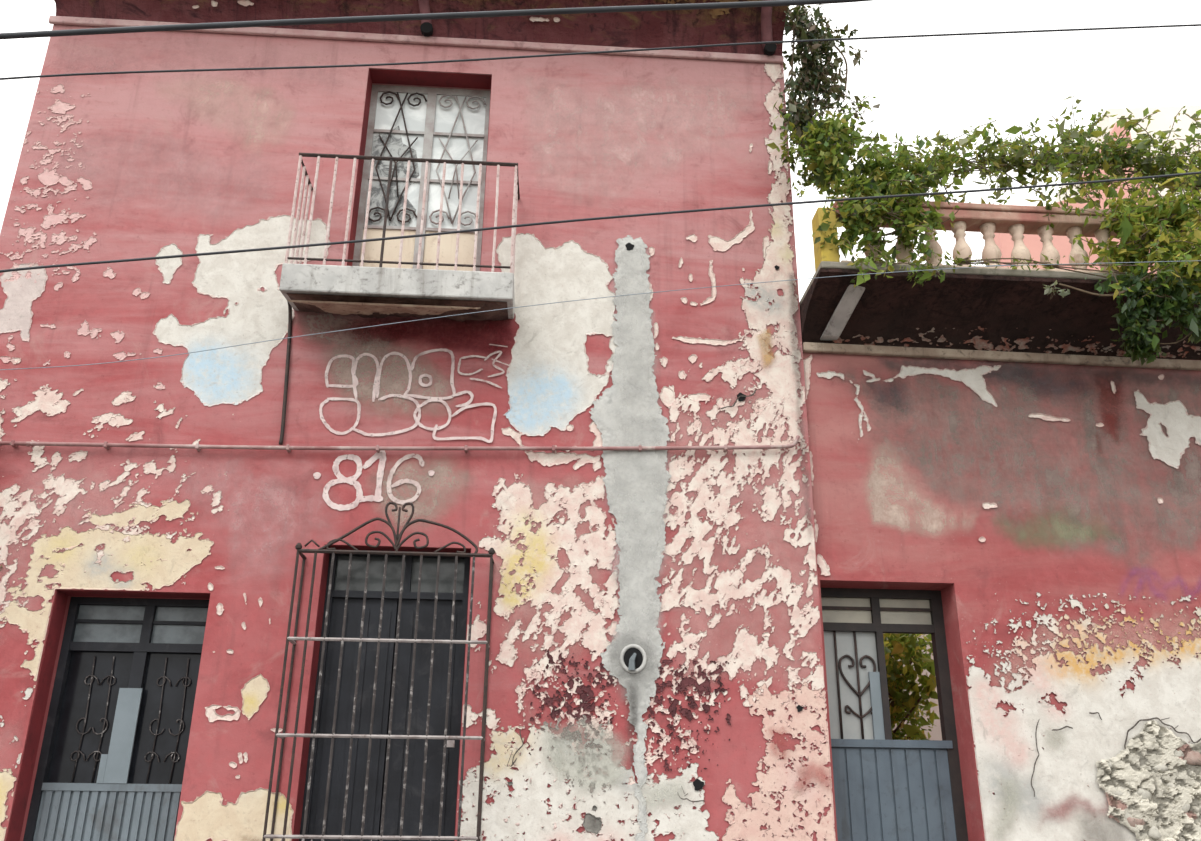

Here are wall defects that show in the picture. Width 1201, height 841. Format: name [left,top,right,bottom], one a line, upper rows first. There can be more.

peeling [0,84,97,364]
peeling [77,215,480,415]
peeling [0,378,84,441]
peeling [153,382,188,428]
peeling [457,63,1134,841]
peeling [1134,390,1201,469]
peeling [0,391,229,706]
peeling [0,736,22,841]
peeling [174,752,294,841]
peeling [205,674,270,722]
damp [529,650,731,804]
peeling [966,592,1201,841]